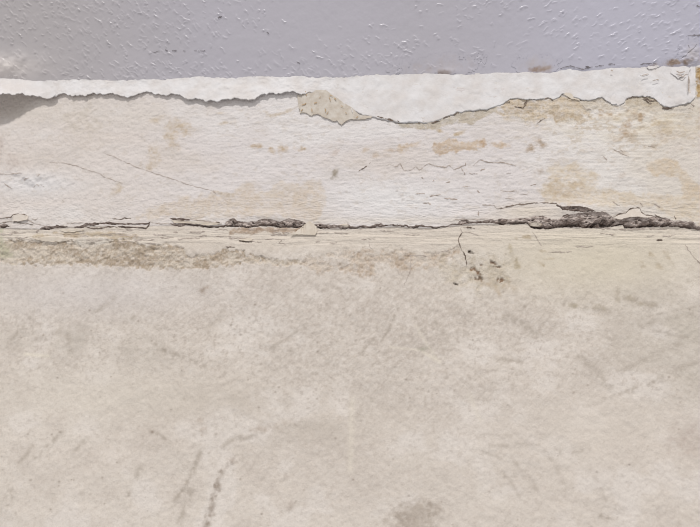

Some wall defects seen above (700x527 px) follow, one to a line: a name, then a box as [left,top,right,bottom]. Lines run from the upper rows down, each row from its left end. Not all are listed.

peeling [0,65,695,130]
crack [0,160,700,285]